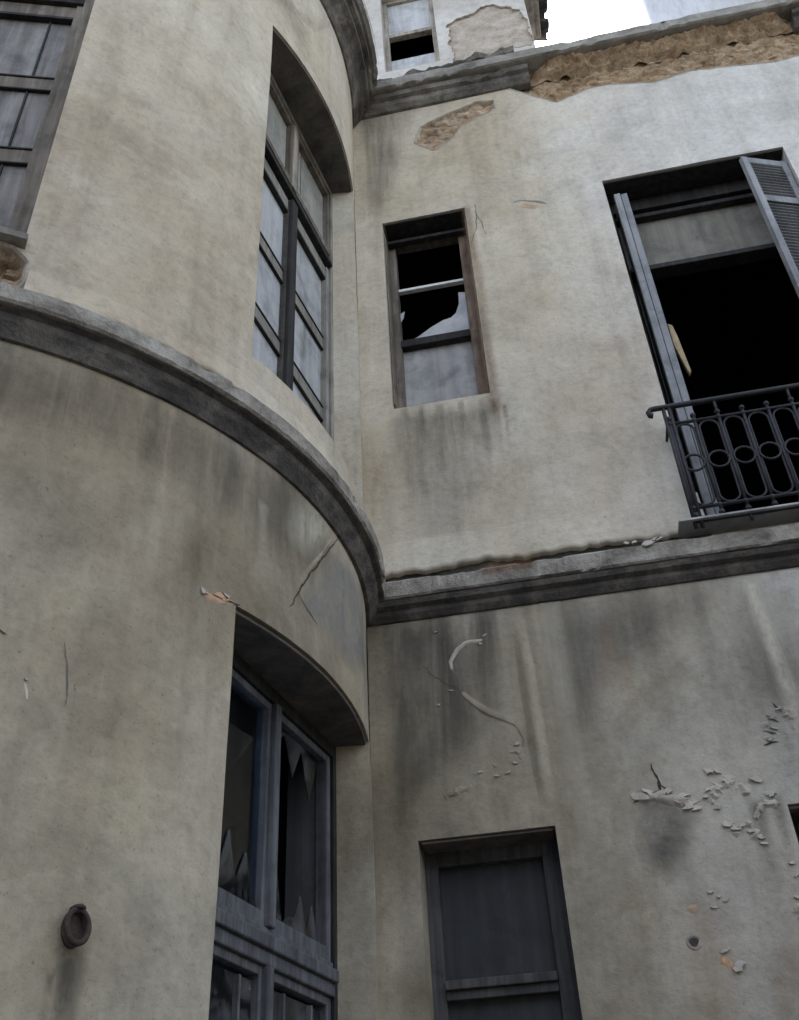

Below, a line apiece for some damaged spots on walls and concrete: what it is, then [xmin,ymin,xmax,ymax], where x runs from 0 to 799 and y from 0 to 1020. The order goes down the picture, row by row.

flaking render [446,4,534,62]
flaking render [508,12,799,103]
flaking render [414,100,497,151]
flaking render [0,241,31,288]
crack [289,539,338,625]
damp [747,582,792,696]
flaking render [760,703,799,747]
flaking render [630,768,782,845]